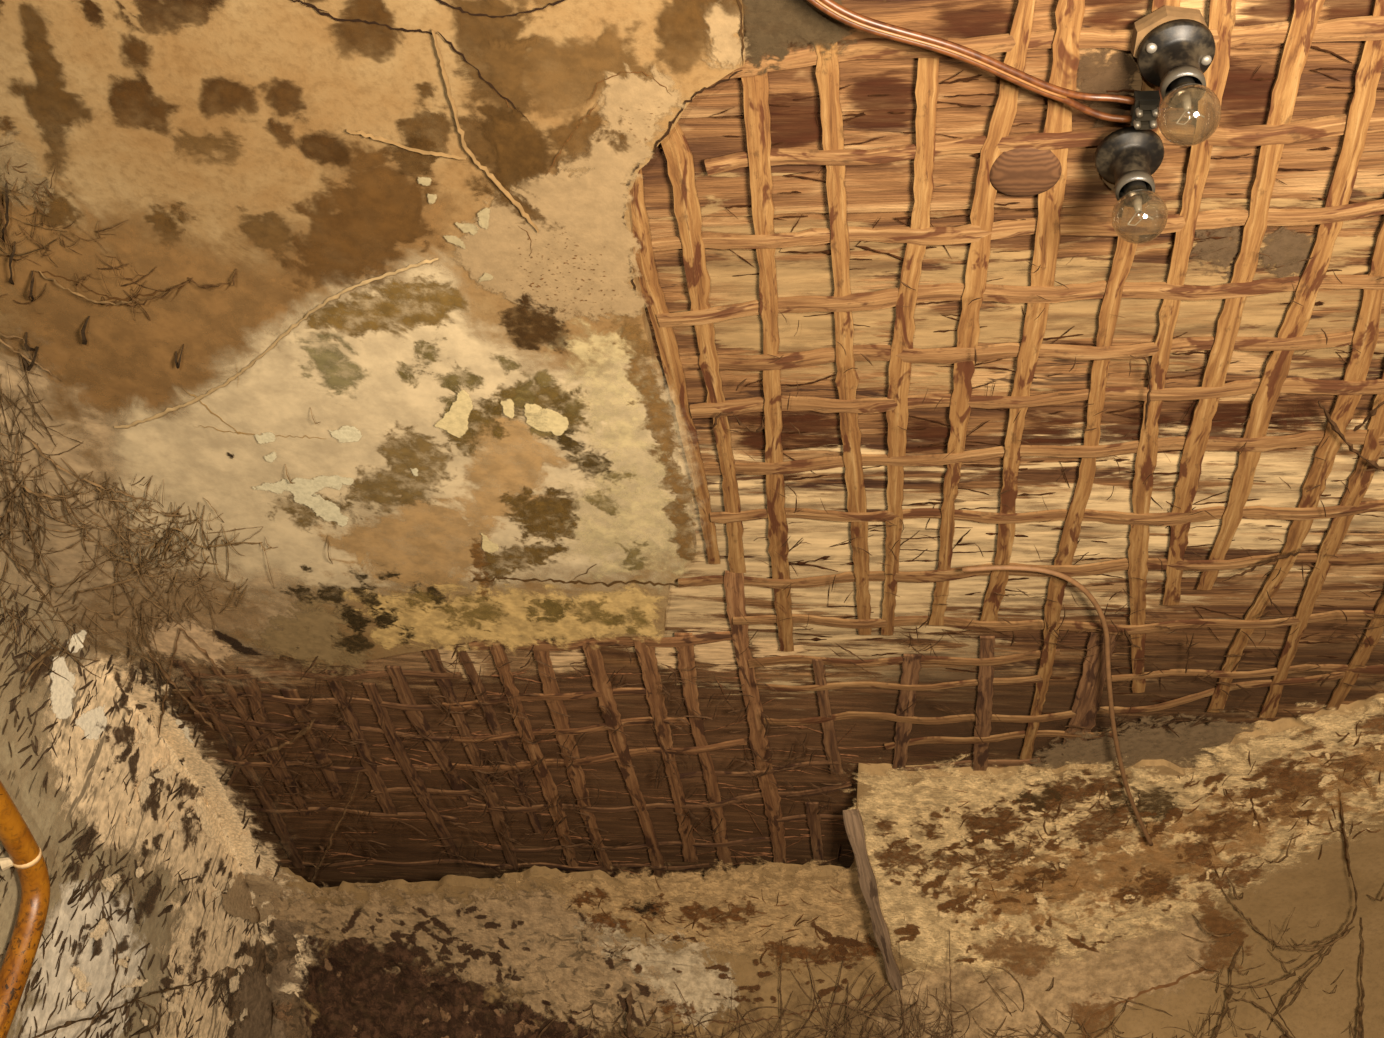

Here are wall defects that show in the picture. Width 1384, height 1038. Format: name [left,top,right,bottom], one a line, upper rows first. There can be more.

peeling [418,177,437,204]
crack [291,0,565,120]
flaking render [444,0,746,323]
crack [546,71,673,175]
leakage [1221,49,1276,127]
leakage [1324,0,1375,19]
peeling [252,475,354,527]
peeling [435,390,473,438]
peeling [501,399,569,436]
leakage [0,0,1197,887]
leakage [1151,403,1359,577]
leakage [945,734,1384,980]